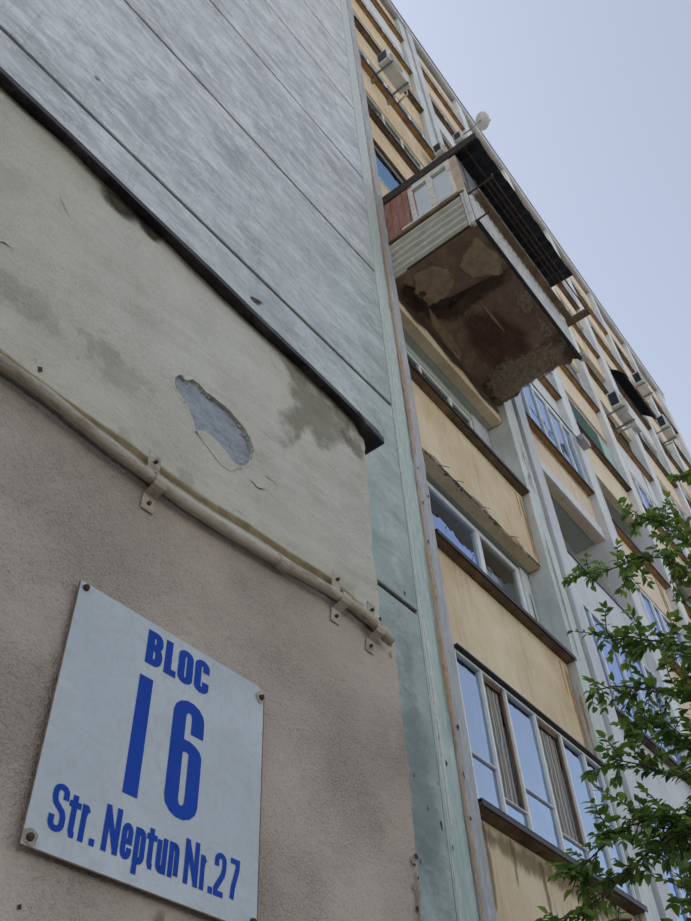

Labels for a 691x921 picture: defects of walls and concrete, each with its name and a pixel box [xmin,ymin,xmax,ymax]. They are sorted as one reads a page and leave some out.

leakage [403,271,505,319]
peeling [413,236,504,360]
spalling [486,341,564,402]
spalling [171,372,256,472]